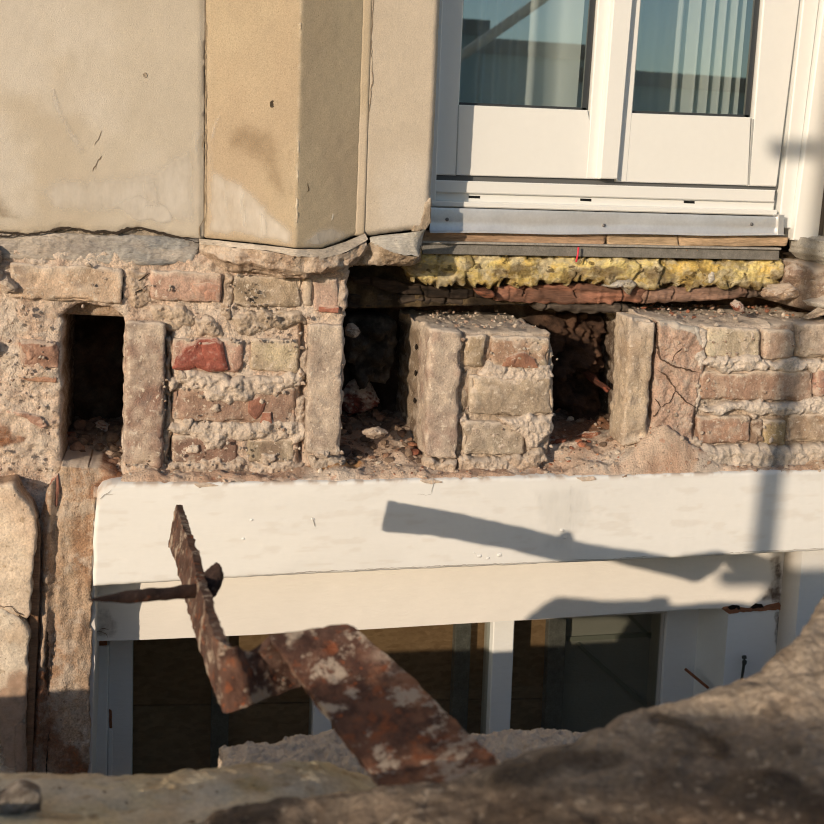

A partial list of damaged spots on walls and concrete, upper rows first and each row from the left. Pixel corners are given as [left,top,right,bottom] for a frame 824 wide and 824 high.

crack [367,0,375,120]
spalling [192,282,221,303]
spalling [19,339,60,383]
spalling [172,337,228,372]
crack [653,322,699,417]
spalling [7,410,47,428]
spalling [248,397,272,424]